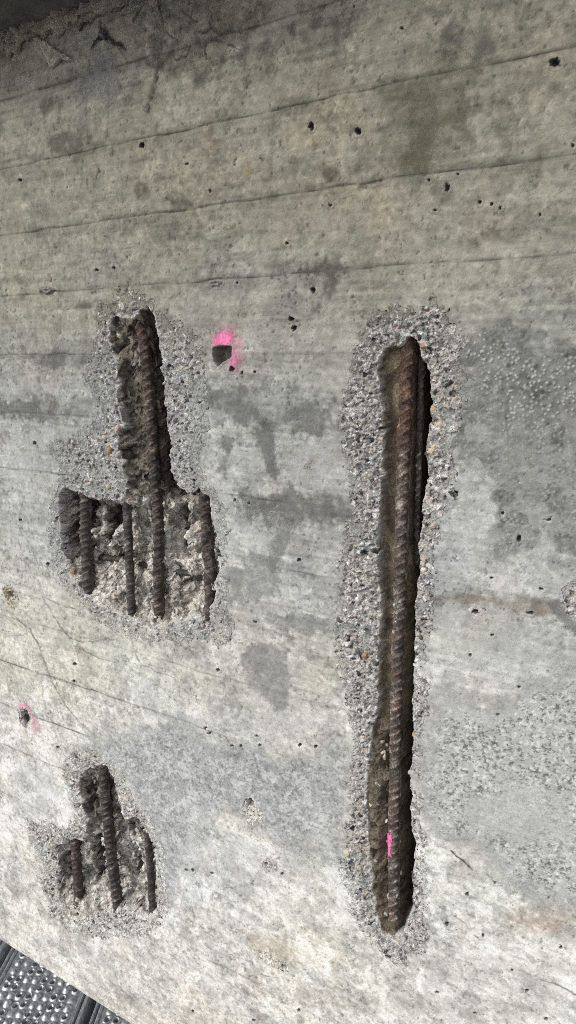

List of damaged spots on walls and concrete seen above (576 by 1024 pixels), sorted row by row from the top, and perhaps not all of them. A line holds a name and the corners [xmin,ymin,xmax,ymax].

spalling [24,283,576,972]